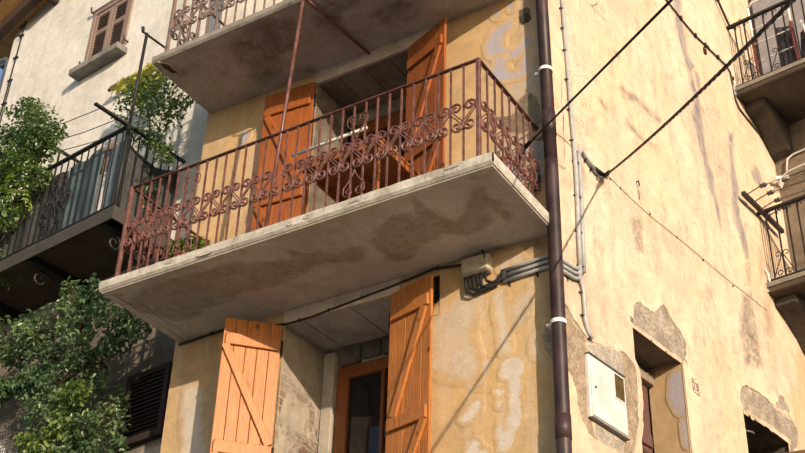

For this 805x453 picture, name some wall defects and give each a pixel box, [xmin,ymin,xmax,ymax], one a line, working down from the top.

water stain [218,0,433,90]
peeling [480,0,545,193]
water stain [122,171,519,324]
water stain [432,233,549,389]
peeling [455,352,529,453]
flaking render [536,316,553,368]
flaking render [565,298,644,453]
water stain [625,205,649,263]
flaking render [627,294,690,452]
water stain [671,0,775,377]
flaking render [735,337,805,452]